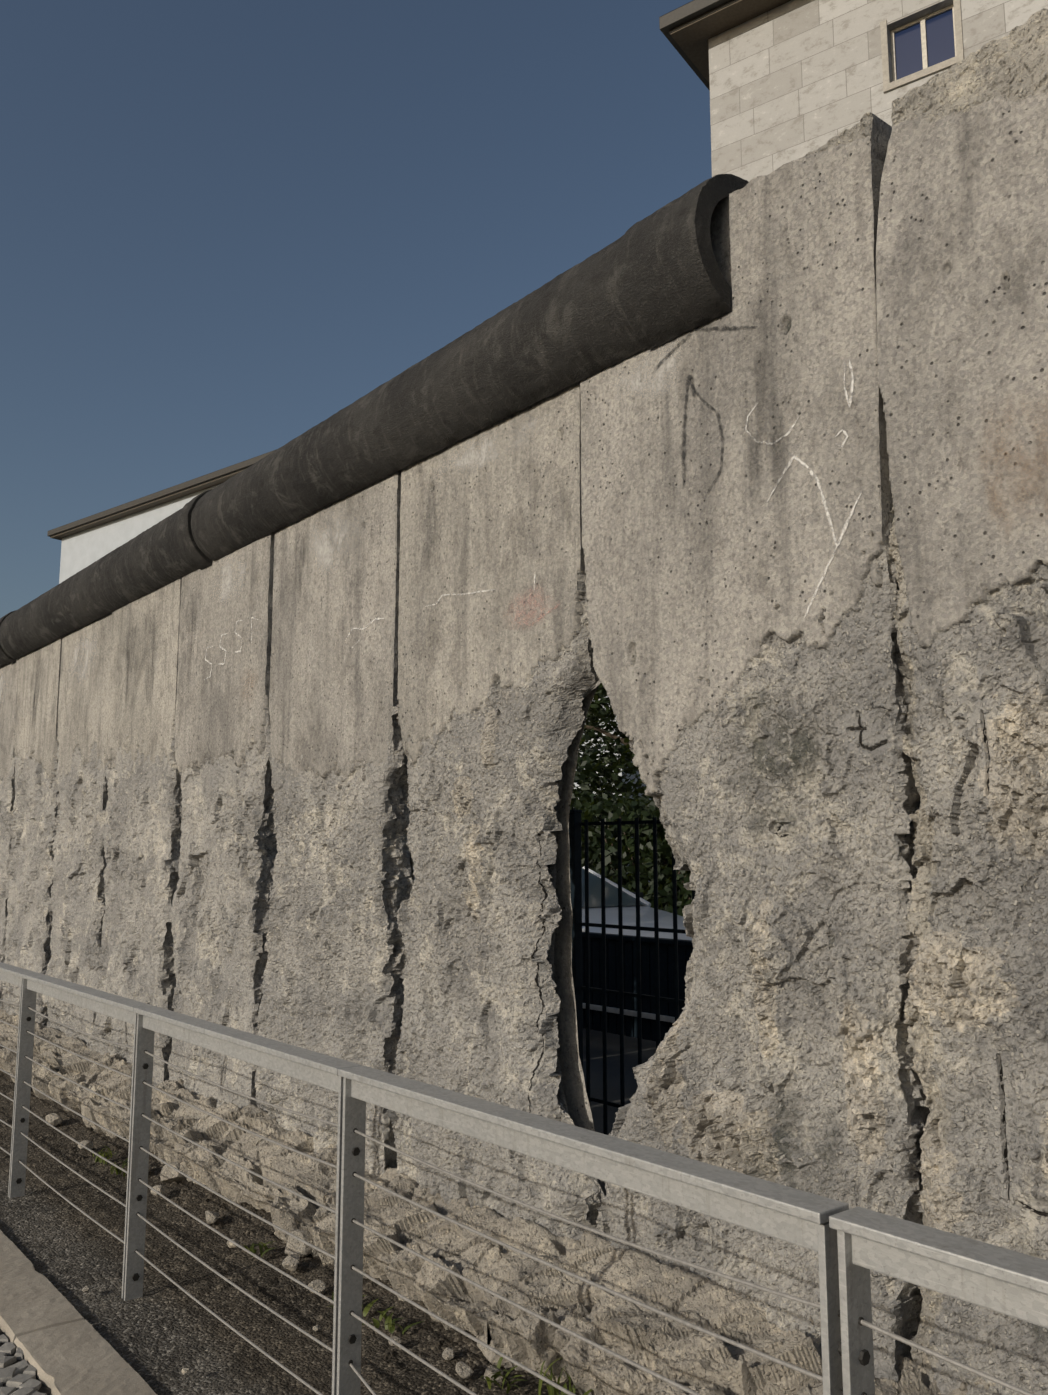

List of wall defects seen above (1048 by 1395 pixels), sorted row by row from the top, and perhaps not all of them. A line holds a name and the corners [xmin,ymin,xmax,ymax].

spalling [0,569,596,1124]
crack [528,828,548,1113]
spalling [609,494,1048,1260]
crack [850,713,887,751]
spalling [153,1032,338,1154]
spalling [365,1102,821,1335]
spalling [870,1270,1048,1395]